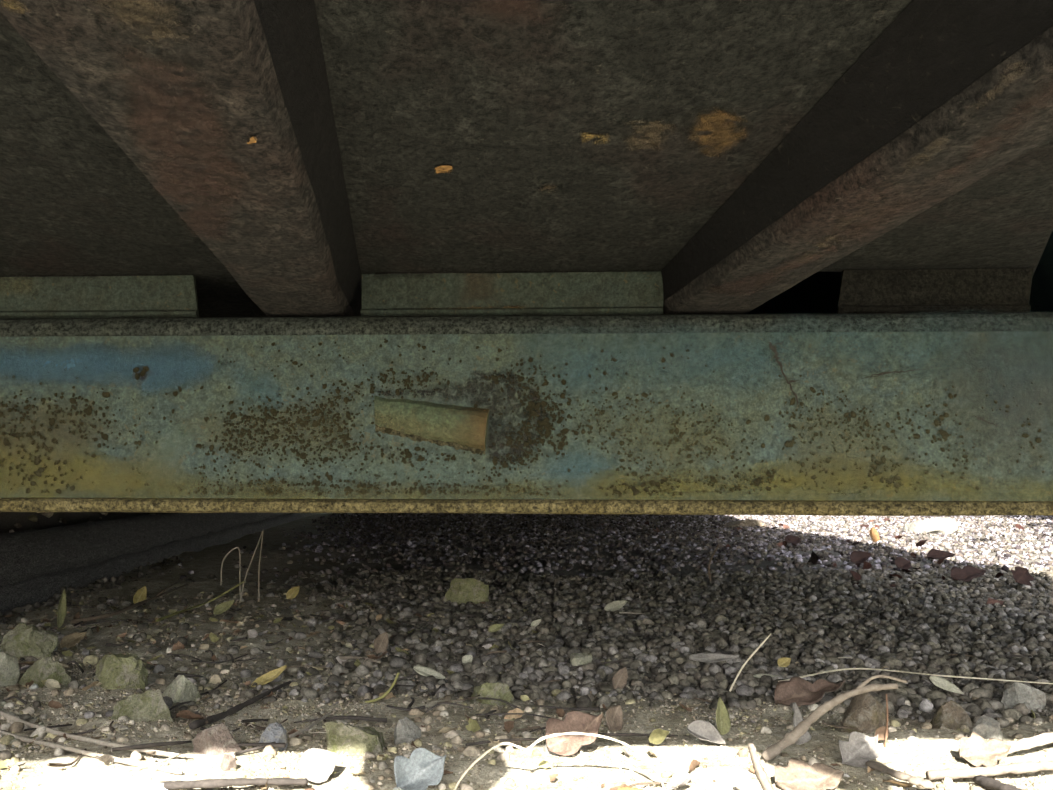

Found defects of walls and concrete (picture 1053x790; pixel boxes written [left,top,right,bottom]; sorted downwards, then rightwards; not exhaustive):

corrosion [195,400,325,461]
corrosion [315,383,374,458]
corrosion [379,348,617,496]
corrosion [292,474,456,496]